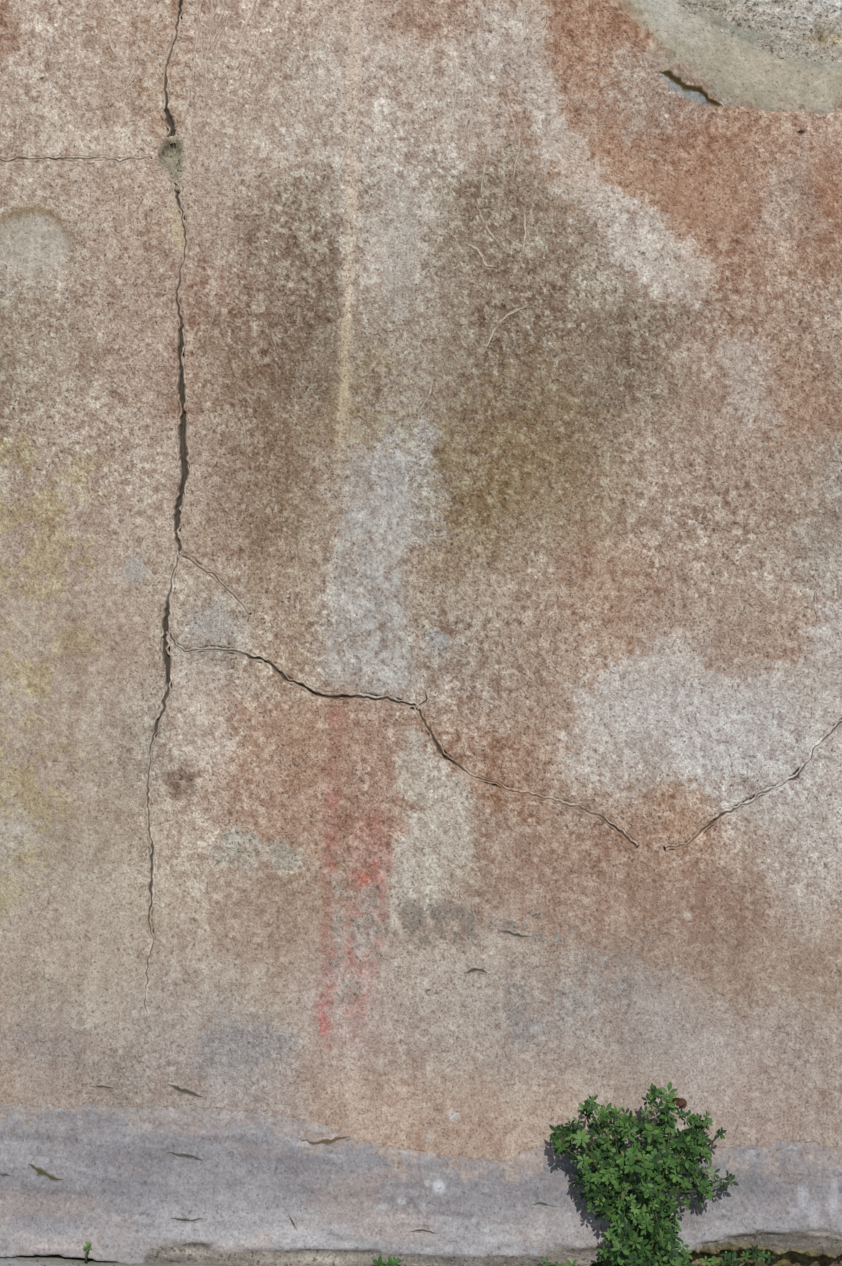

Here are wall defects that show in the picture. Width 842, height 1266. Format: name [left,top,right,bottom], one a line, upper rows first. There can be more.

crack [0,0,184,164]
crack [142,181,842,1021]